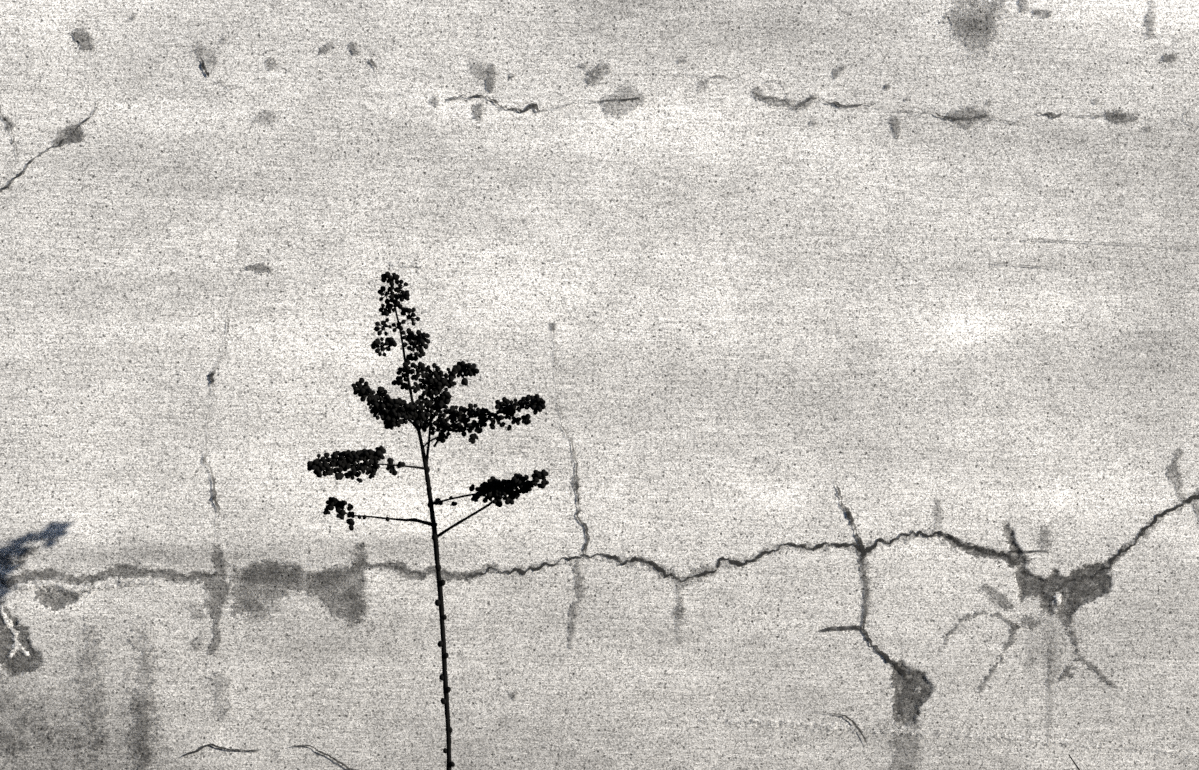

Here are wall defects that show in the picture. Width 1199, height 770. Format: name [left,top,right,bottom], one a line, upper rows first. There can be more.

crack [431,60,543,120]
crack [678,58,725,88]
crack [754,81,874,125]
crack [1035,111,1064,119]
crack [203,454,220,514]
crack [0,563,211,631]
leakage [187,543,368,656]
crack [364,407,1199,736]
crack [182,743,260,757]
crack [290,745,358,770]